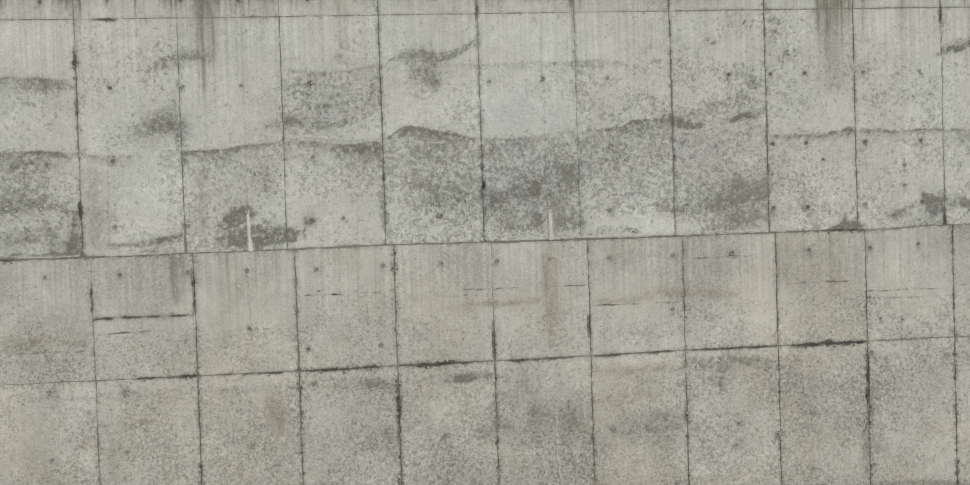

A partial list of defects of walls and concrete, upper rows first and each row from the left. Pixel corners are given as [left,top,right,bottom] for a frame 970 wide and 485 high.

damp [133,99,275,164]
damp [217,205,317,252]